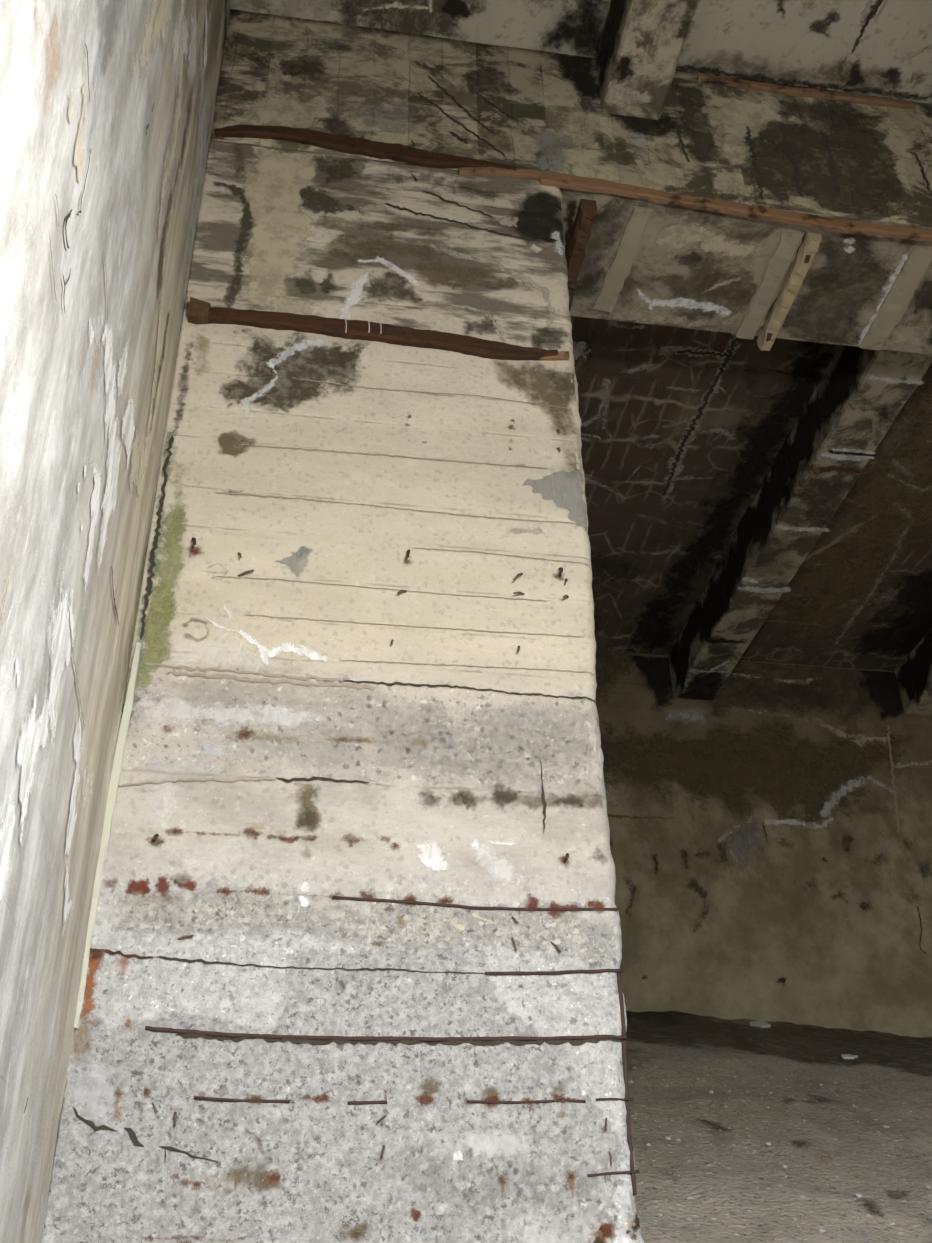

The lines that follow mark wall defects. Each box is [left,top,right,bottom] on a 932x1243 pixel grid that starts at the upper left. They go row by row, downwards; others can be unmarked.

peeling [136,0,173,76]
crack [851,0,887,54]
rust [215,124,932,241]
damp [614,55,715,163]
damp [741,99,900,213]
damp [221,330,360,412]
rust [188,297,570,361]
damp [0,0,254,924]
damp [494,381,932,930]
rust [126,877,196,896]
rust [80,950,105,1017]
spalling [49,885,639,1243]